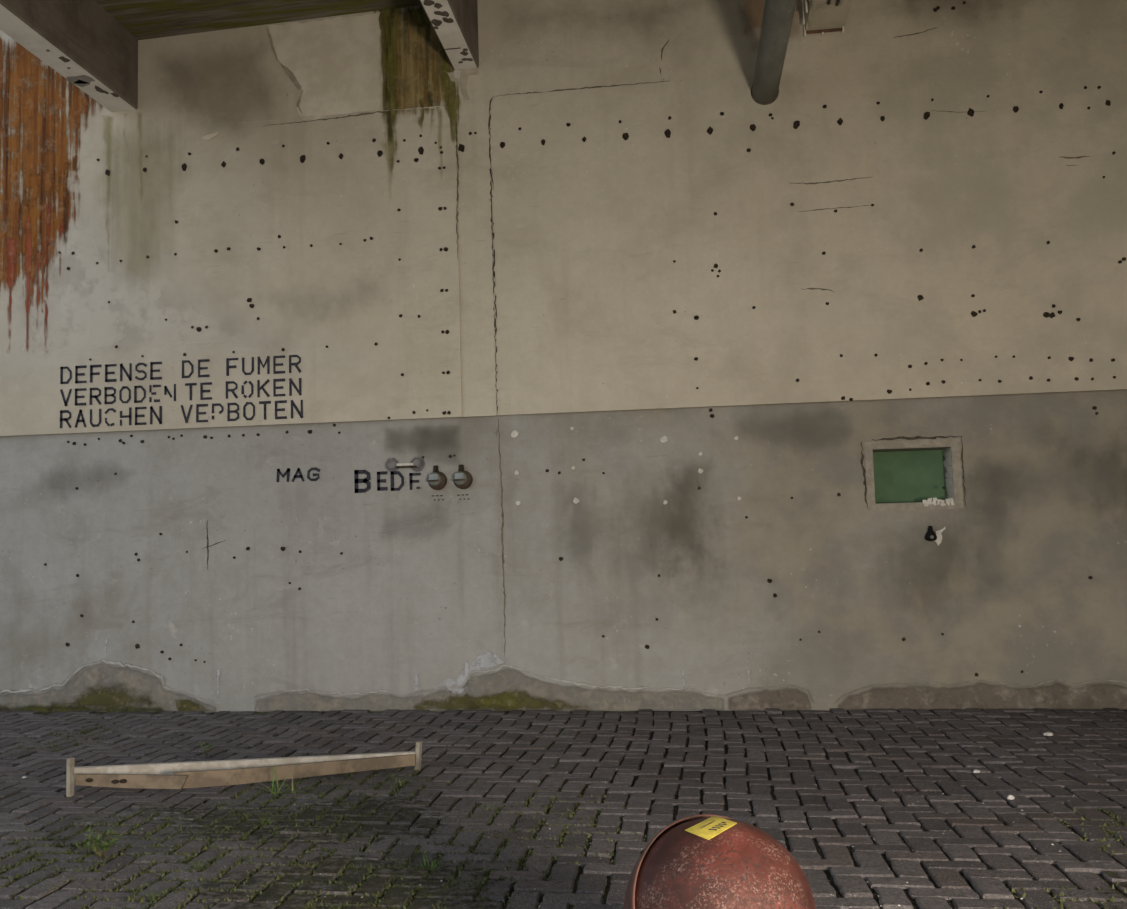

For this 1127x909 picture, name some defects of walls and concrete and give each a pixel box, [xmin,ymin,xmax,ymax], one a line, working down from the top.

leakage [375,5,463,169]
rust [0,38,101,349]
efflorescence [441,651,504,694]